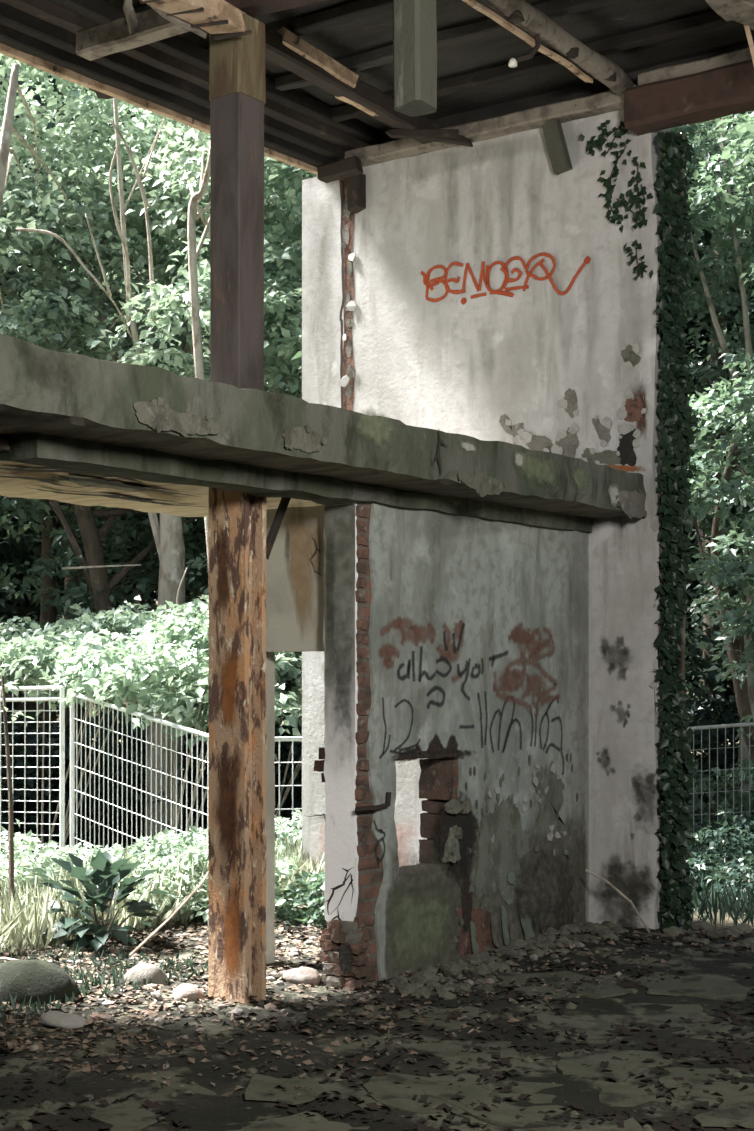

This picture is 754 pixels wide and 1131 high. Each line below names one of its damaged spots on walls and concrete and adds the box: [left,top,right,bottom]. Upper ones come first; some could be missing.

flaking render [621,343,641,369]
spalling [499,388,647,466]
flaking render [355,506,381,870]
flaking render [398,753,579,957]
flaking render [319,900,376,990]